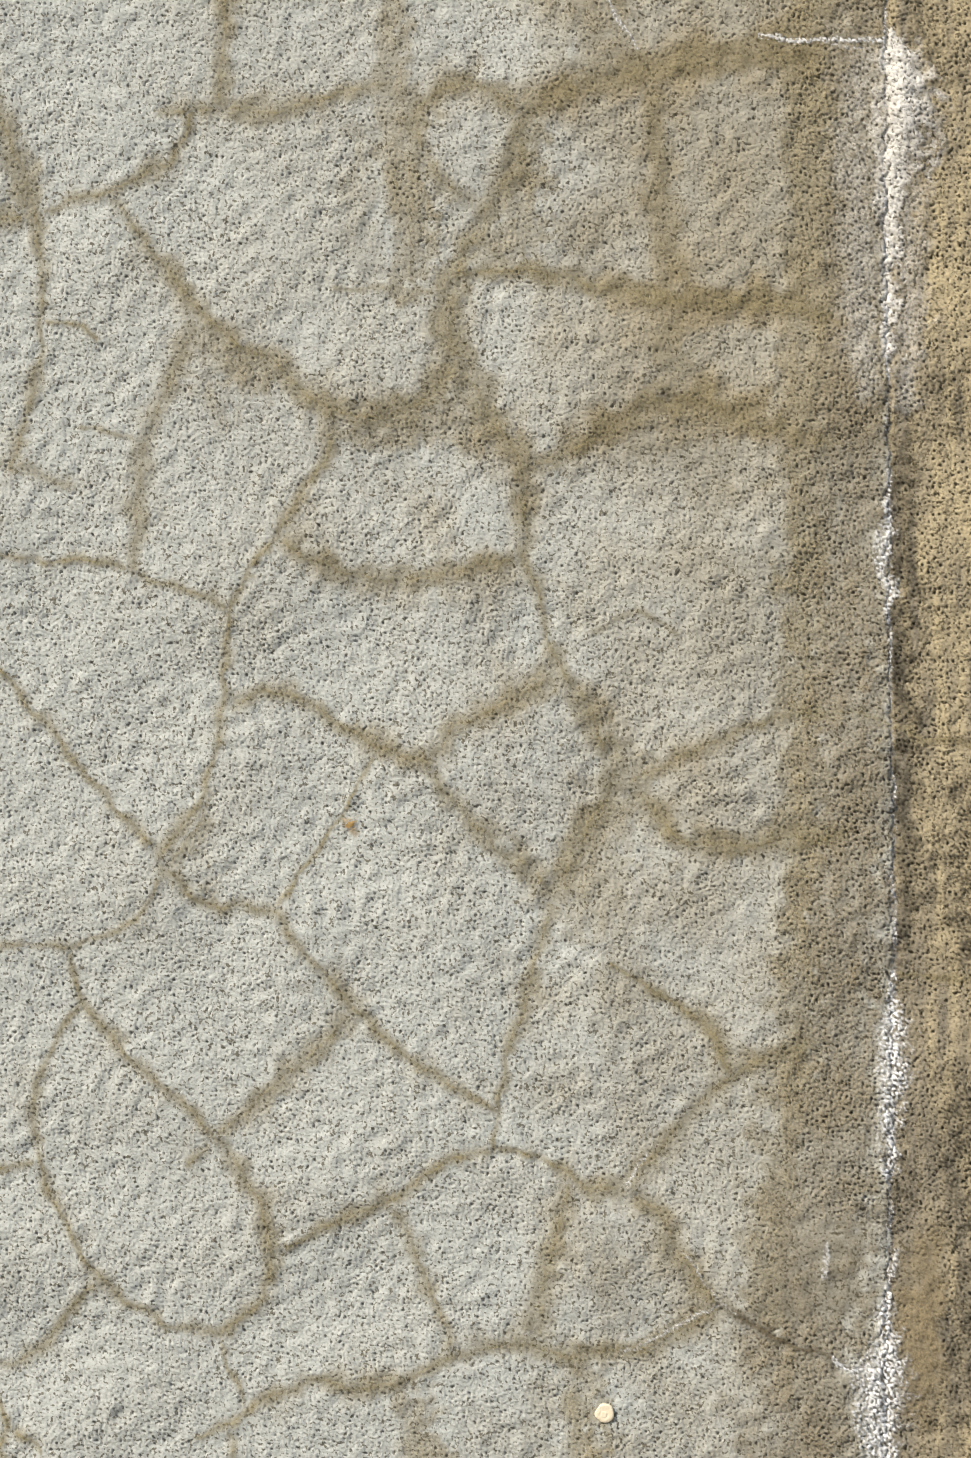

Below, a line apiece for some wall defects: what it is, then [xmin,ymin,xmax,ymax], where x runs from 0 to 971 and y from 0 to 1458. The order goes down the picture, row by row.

crack [0,0,383,339]
crack [610,4,885,75]
leakage [781,0,832,335]
leakage [853,0,944,377]
crack [132,174,834,605]
crack [61,598,441,937]
leakage [775,452,971,1236]
crack [0,1407,29,1453]
crack [33,946,232,1165]
crack [0,979,655,1334]
crack [493,1259,864,1370]
leakage [750,1247,971,1458]